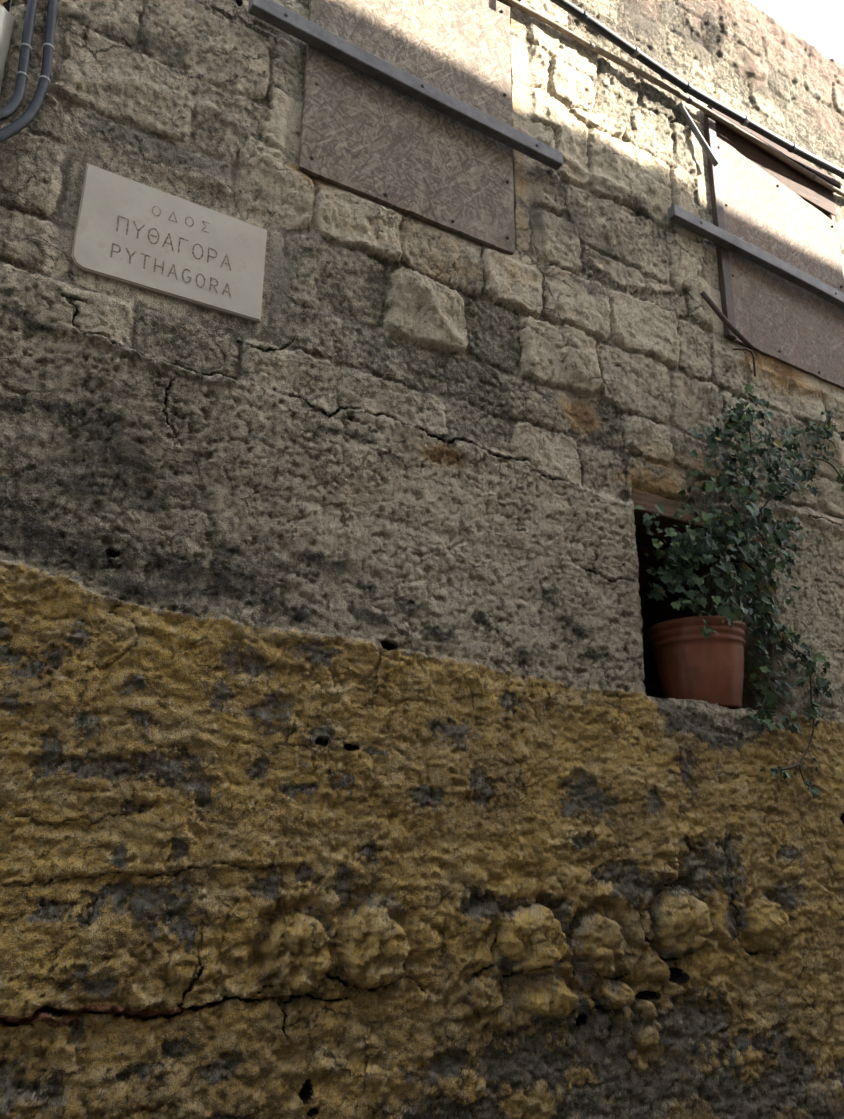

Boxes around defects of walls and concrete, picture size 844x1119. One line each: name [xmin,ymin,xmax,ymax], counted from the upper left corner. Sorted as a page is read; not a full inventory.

crack [66,296,142,355]
crack [239,340,293,352]
crack [162,364,228,446]
spalling [118,671,158,697]
spalling [208,642,294,737]
spalling [31,710,222,822]
spalling [25,835,211,954]
crack [3,842,269,917]
crack [3,933,425,1040]
spalling [0,1057,64,1118]
spalling [98,1038,253,1093]
spalling [376,983,844,1119]